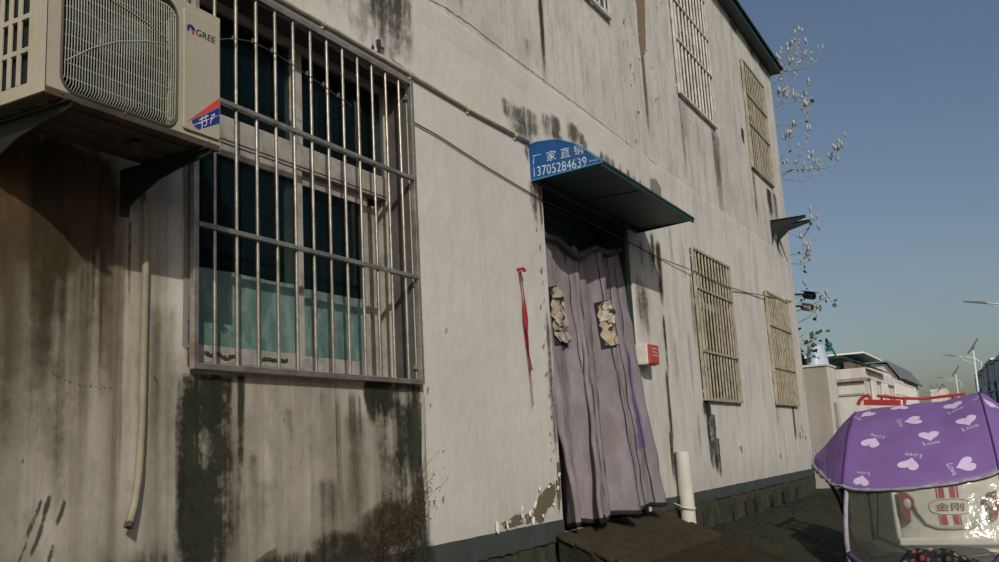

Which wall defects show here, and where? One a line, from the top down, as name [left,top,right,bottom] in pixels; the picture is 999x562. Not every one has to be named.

leakage [360,0,411,54]
leakage [504,99,587,158]
leakage [531,184,543,222]
leakage [0,131,131,380]
leakage [637,276,649,328]
leakage [640,235,663,297]
leakage [176,374,245,562]
leakage [349,382,433,562]
flaking render [496,322,561,534]
leakage [663,317,675,475]
leakage [703,401,722,473]